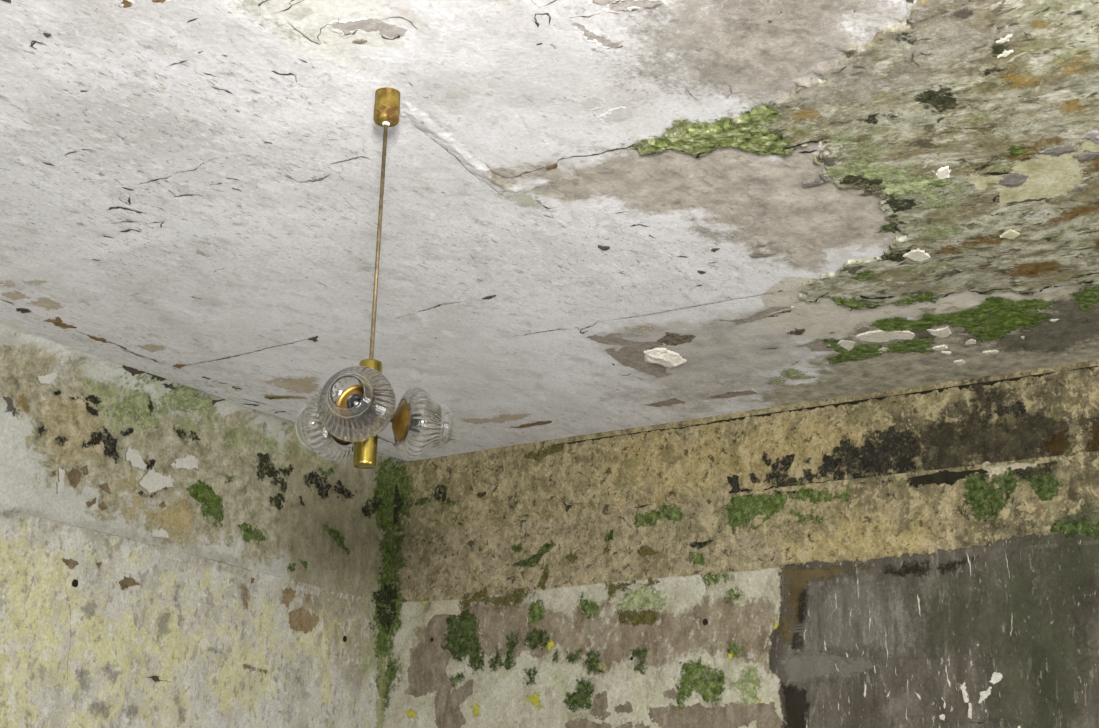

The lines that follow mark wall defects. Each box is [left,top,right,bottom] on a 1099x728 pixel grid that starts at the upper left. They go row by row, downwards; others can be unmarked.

flaking render [327,18,408,44]
peeling [994,23,1019,58]
crack [419,129,635,199]
leakage [611,0,1099,356]
flaking render [965,139,1099,207]
flaking render [586,332,696,379]
peeling [787,325,915,353]
flaking render [36,372,111,494]
leakage [727,382,1071,497]
peeling [125,446,199,509]
leakage [769,529,1099,728]
peeling [404,601,474,728]